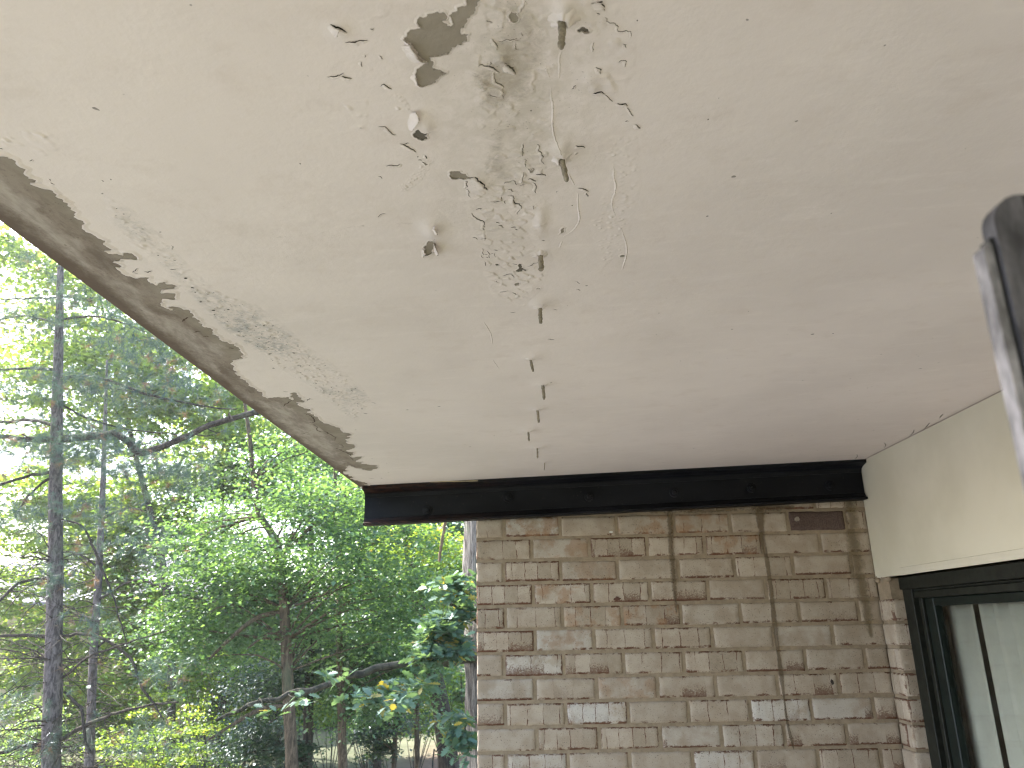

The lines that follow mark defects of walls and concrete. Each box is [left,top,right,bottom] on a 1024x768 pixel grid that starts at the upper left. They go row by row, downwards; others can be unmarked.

peeling [327,25,368,46]
peeling [408,112,430,141]
peeling [400,0,483,88]
crack [572,1,640,130]
peeling [421,226,438,260]
crack [463,144,546,313]
peeling [0,151,381,487]
leakage [653,505,794,749]